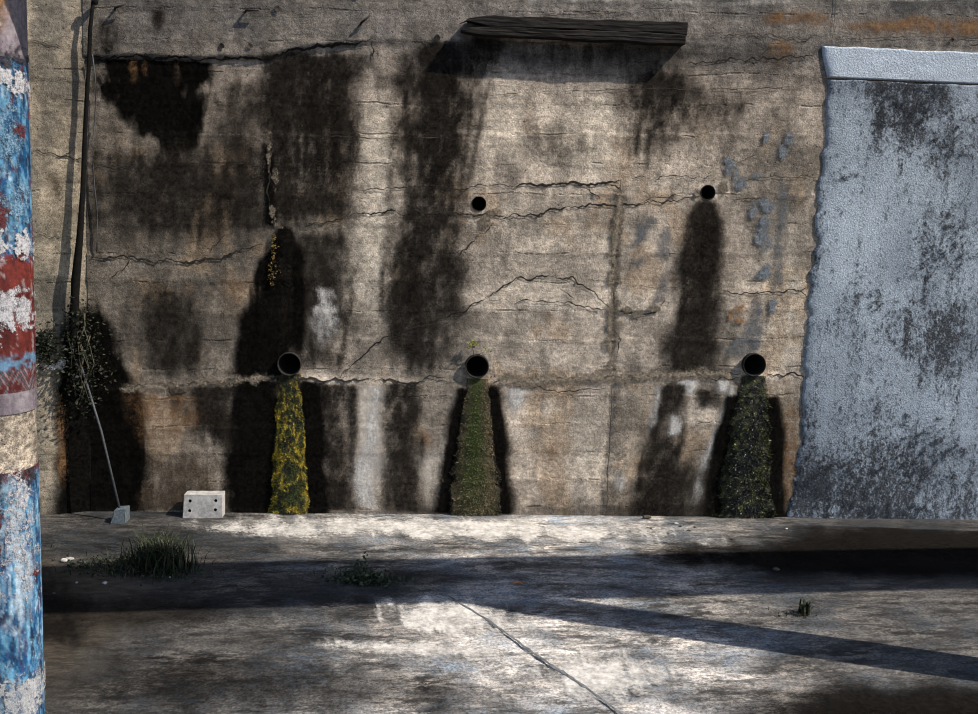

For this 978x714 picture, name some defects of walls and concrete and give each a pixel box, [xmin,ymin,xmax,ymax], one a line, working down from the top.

crack [31,36,376,61]
peeling [0,44,35,261]
crack [38,150,130,170]
peeling [0,283,36,348]
peeling [0,408,42,609]
water stain [54,25,362,514]
water stain [298,381,469,514]
crack [92,143,815,513]
water stain [629,200,740,517]
water stain [646,396,978,577]
peeling [0,662,46,714]
crack [440,591,623,714]